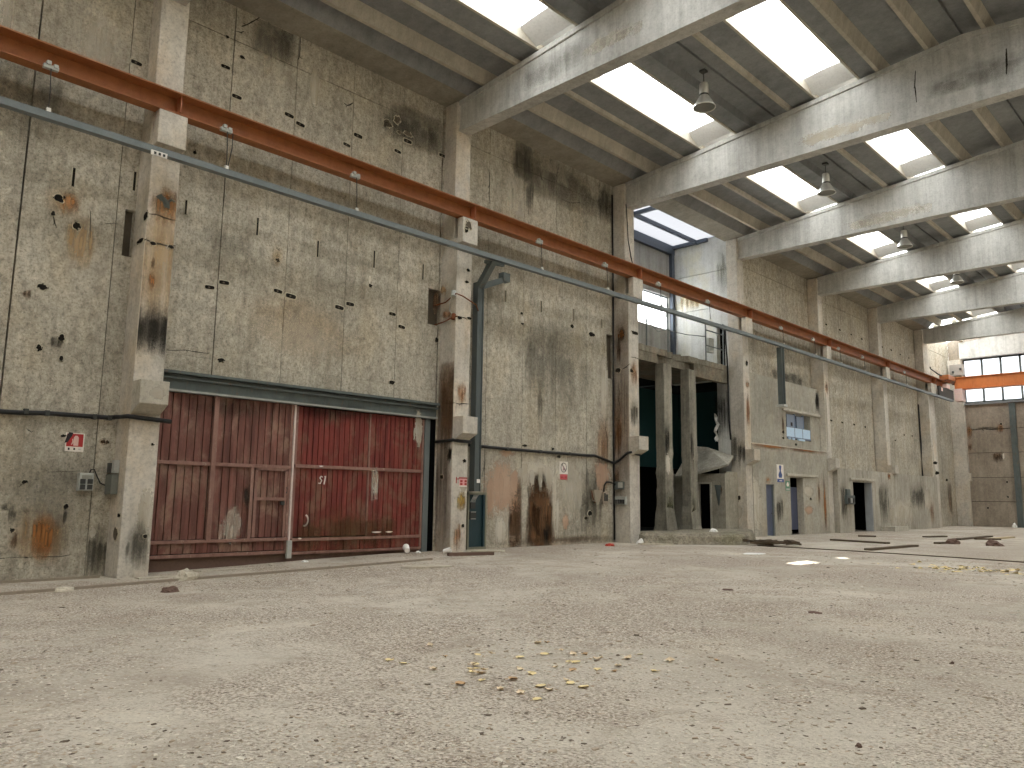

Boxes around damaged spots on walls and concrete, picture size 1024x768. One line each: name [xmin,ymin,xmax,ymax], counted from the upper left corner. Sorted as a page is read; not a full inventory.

crack [137,214,176,249]
leakage [138,320,167,346]
leakage [509,475,554,547]
rust [29,521,58,552]